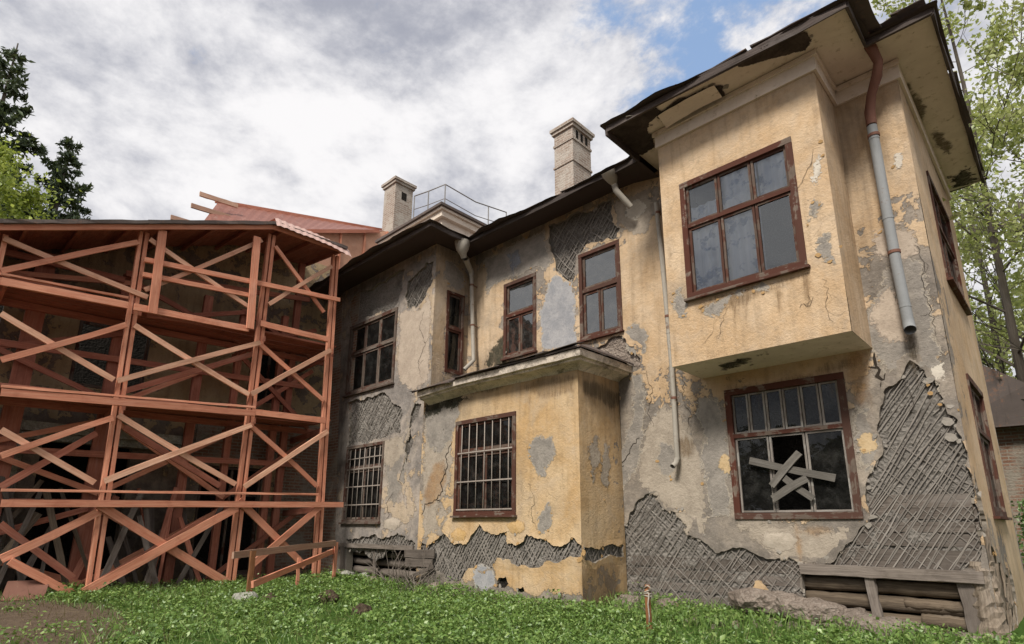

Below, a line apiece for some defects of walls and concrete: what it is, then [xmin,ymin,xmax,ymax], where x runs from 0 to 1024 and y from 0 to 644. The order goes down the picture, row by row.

water stain [907,84,926,119]
water stain [933,132,951,154]
water stain [947,166,986,188]
peeling [807,198,823,226]
flaking render [483,185,655,351]
flaking render [346,222,1018,631]
crack [421,443,452,515]